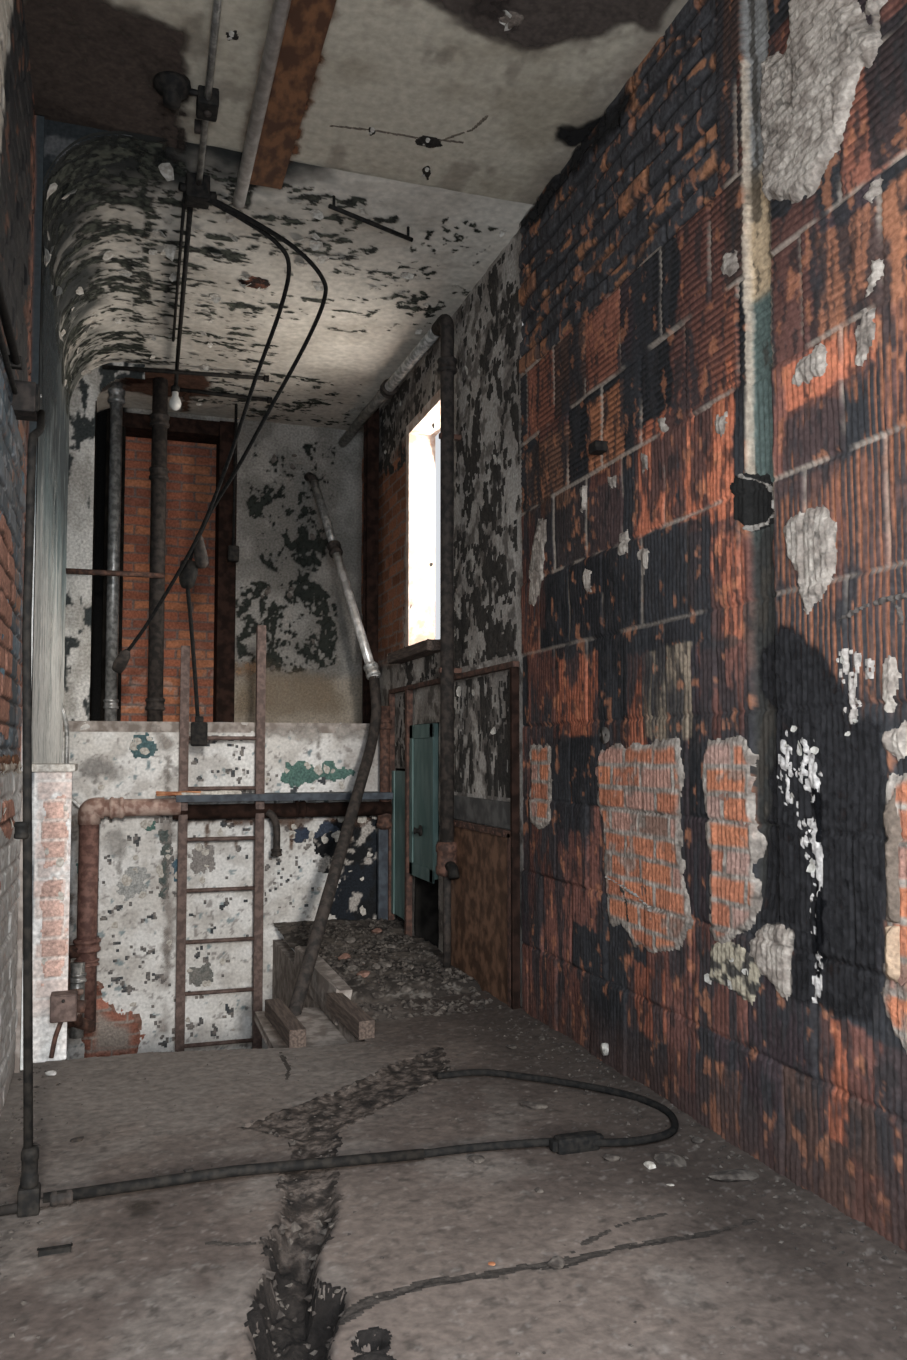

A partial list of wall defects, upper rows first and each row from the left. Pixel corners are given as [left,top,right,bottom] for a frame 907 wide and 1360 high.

peeling [41,137,520,803]
peeling [0,510,22,777]
spalling [81,816,253,1058]
peeling [264,816,377,920]
flaking render [529,744,552,829]
flaking render [595,735,768,1006]
peeling [777,726,824,935]
peeling [812,954,823,1004]
flaking render [880,773,907,1053]
crack [205,1047,758,1360]